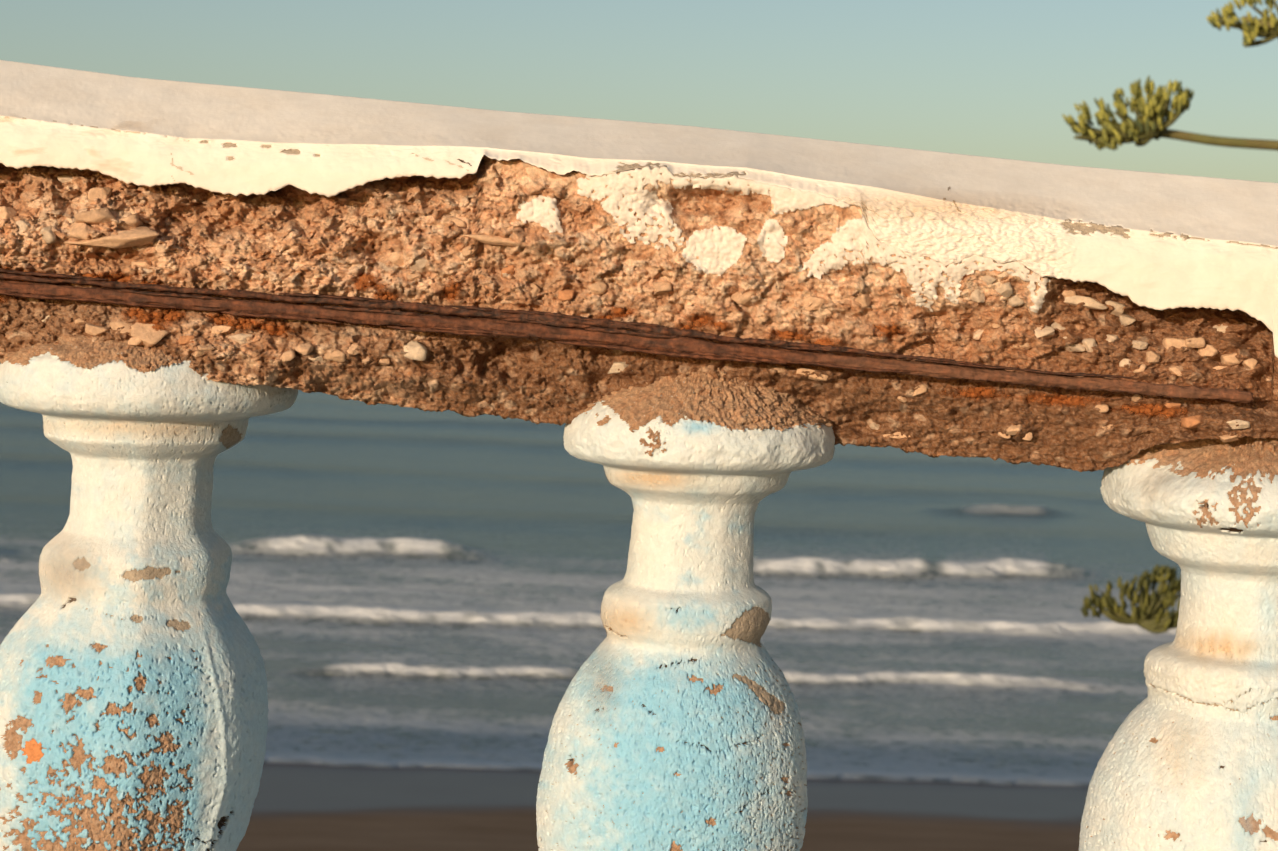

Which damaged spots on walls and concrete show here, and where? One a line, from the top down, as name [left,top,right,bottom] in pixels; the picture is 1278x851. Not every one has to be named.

rust [354,273,397,300]
rust [123,307,184,331]
rust [208,313,291,337]
spalling [0,155,1278,528]
rust [680,313,728,331]
rust [874,324,901,337]
peeling [122,566,181,582]
peeling [721,607,771,648]
crack [1148,683,1278,711]
peeling [0,643,197,851]
peeling [541,732,585,785]
peeling [675,662,806,851]